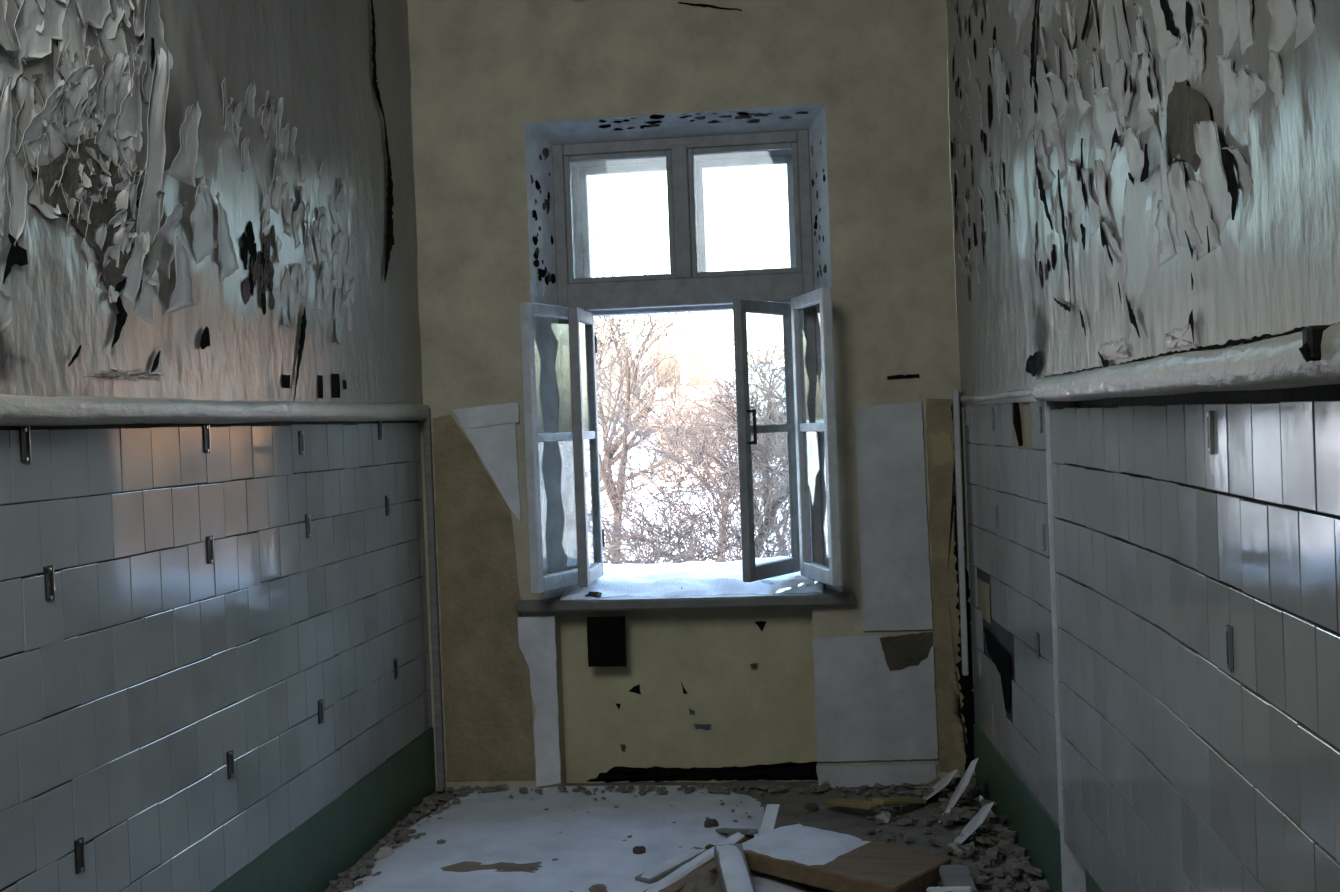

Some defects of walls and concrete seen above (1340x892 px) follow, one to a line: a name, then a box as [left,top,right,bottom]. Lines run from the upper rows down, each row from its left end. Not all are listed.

peeling [0,0,355,343]
crack [371,0,394,282]
peeling [530,148,556,285]
peeling [598,111,808,130]
peeling [951,0,1316,341]
spalling [1025,351,1041,377]
peeling [984,627,1010,712]